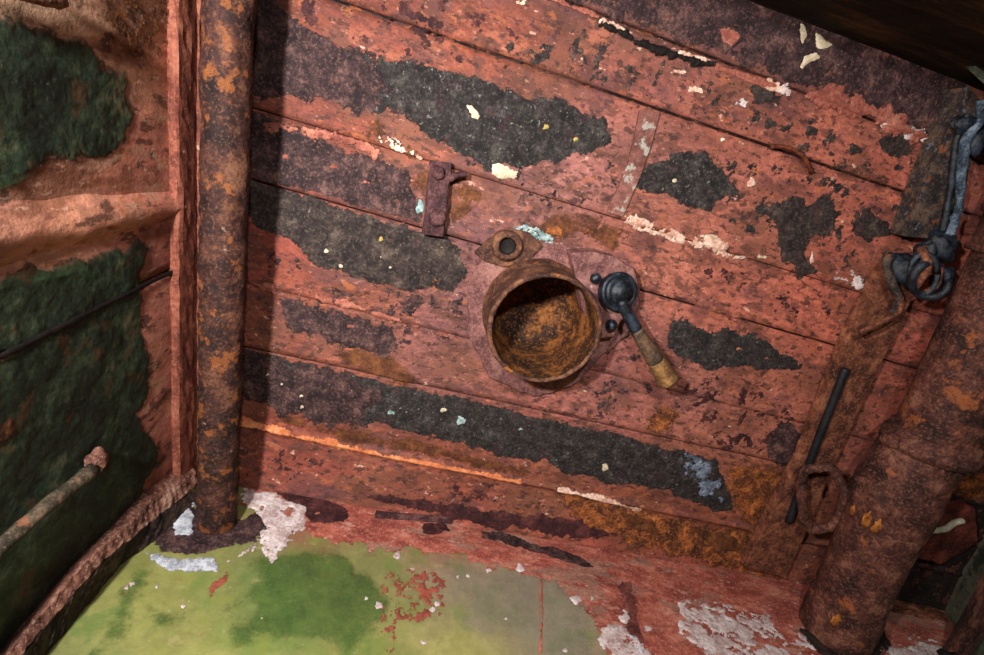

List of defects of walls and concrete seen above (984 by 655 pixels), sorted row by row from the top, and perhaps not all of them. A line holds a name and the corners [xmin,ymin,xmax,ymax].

peeling [568,0,967,158]
peeling [248,0,612,294]
peeling [636,151,755,212]
rust [726,118,851,238]
rust [807,192,903,269]
rust [554,266,914,581]
peeling [209,487,823,655]
rust [829,613,842,627]
peeling [880,610,954,655]